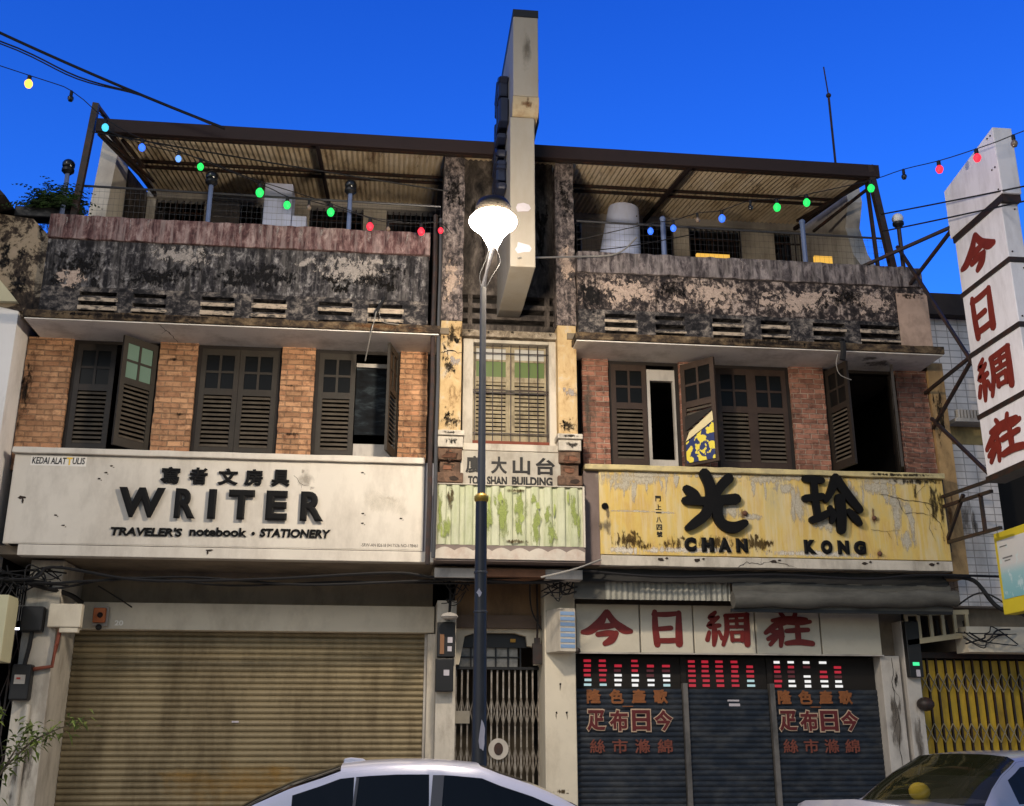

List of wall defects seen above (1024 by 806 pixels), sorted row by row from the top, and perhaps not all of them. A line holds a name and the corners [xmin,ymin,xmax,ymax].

damp [535,205,548,267]
damp [50,251,296,292]
damp [321,262,406,293]
damp [442,322,472,377]
damp [441,411,460,443]
damp [561,384,591,448]
peeling [487,455,581,544]
peeling [601,471,806,521]
peeling [820,476,916,551]
crack [871,483,944,539]
peeling [611,547,732,562]
peeling [766,550,872,565]